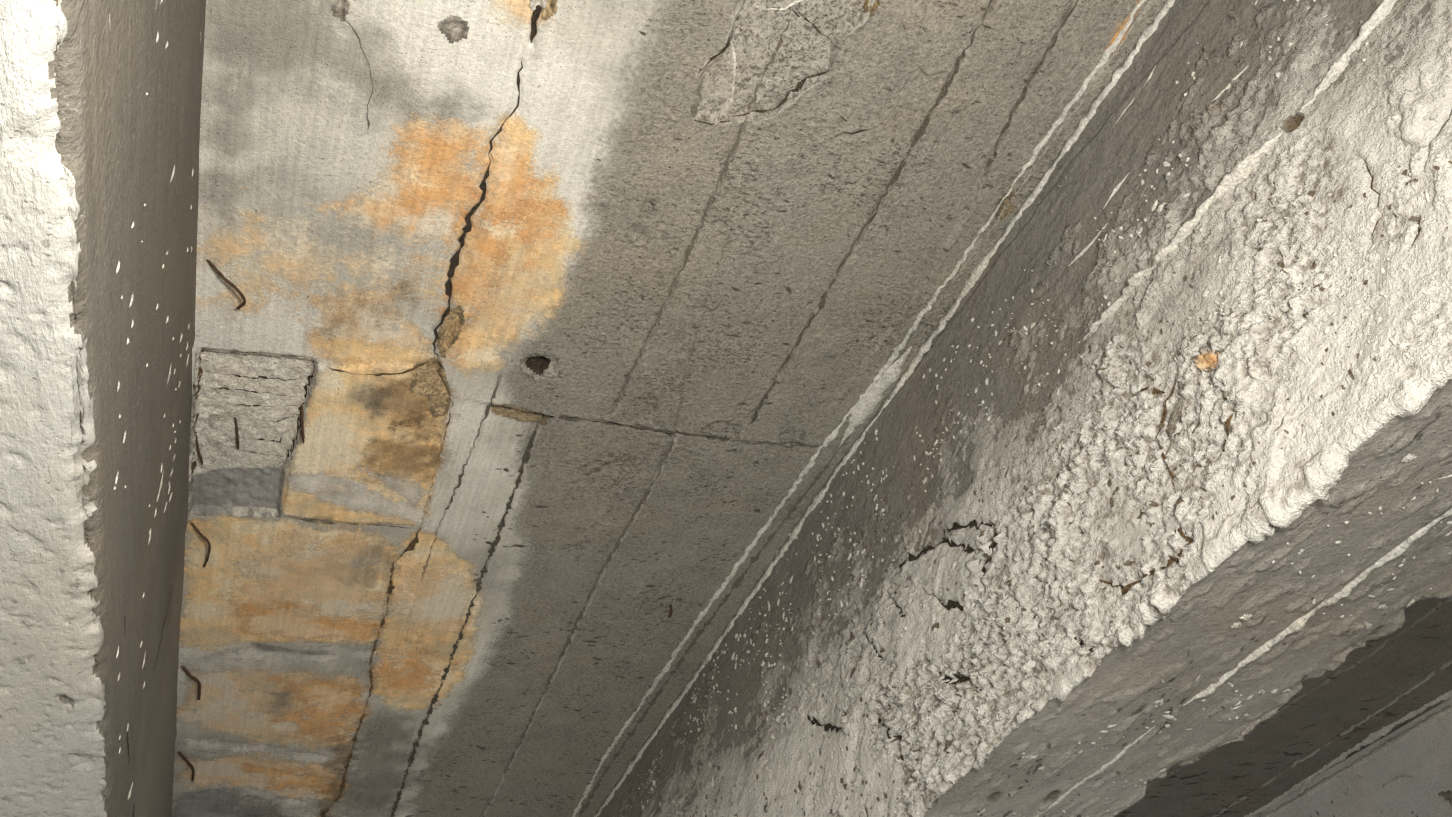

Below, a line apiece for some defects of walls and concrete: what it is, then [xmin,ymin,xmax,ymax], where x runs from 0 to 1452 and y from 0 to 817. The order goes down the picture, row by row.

spalling [188,348,319,518]
rust [176,116,580,802]
leakage [172,0,664,817]
spalling [437,15,469,44]
spalling [529,0,558,20]
crack [321,0,992,817]
crack [984,0,1078,170]
peeling [618,0,1452,817]